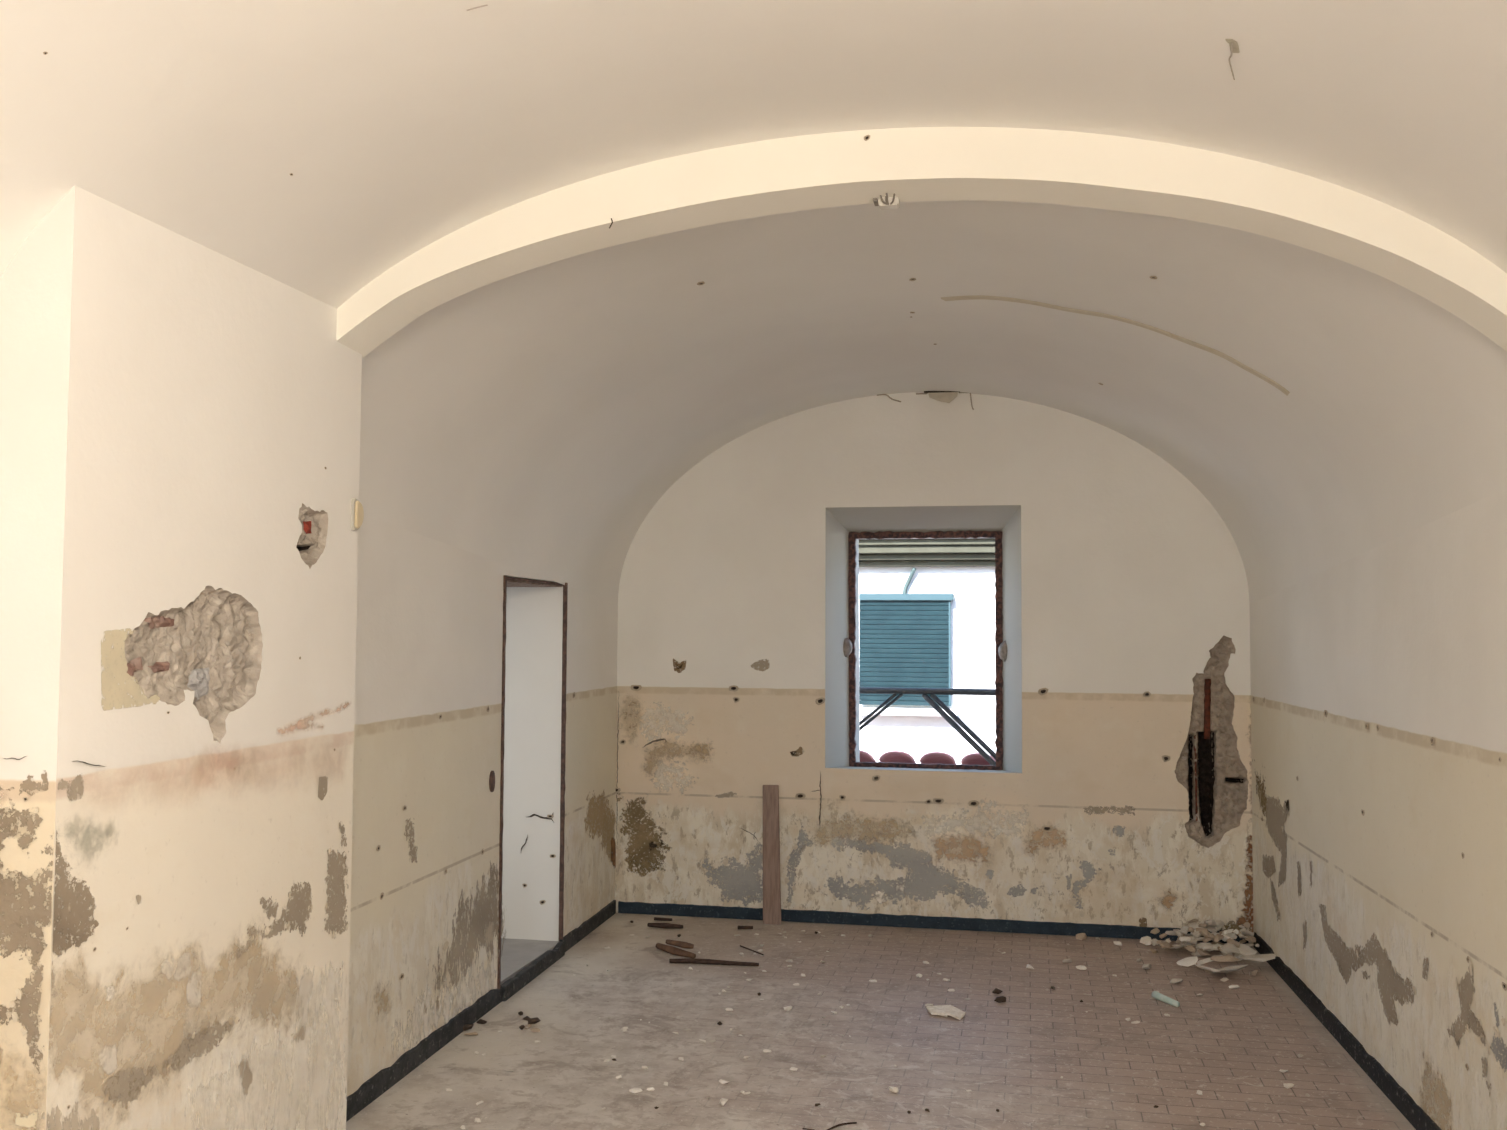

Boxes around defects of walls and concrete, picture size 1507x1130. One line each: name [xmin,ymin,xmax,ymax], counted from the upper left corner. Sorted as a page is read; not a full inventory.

flaking render [296,503,328,568]
flaking render [124,586,263,743]
flaking render [0,771,99,1073]
damp [49,936,302,1106]
flaking render [1262,796,1313,921]
flaking render [1303,904,1429,1026]
flaking render [1447,960,1507,1096]